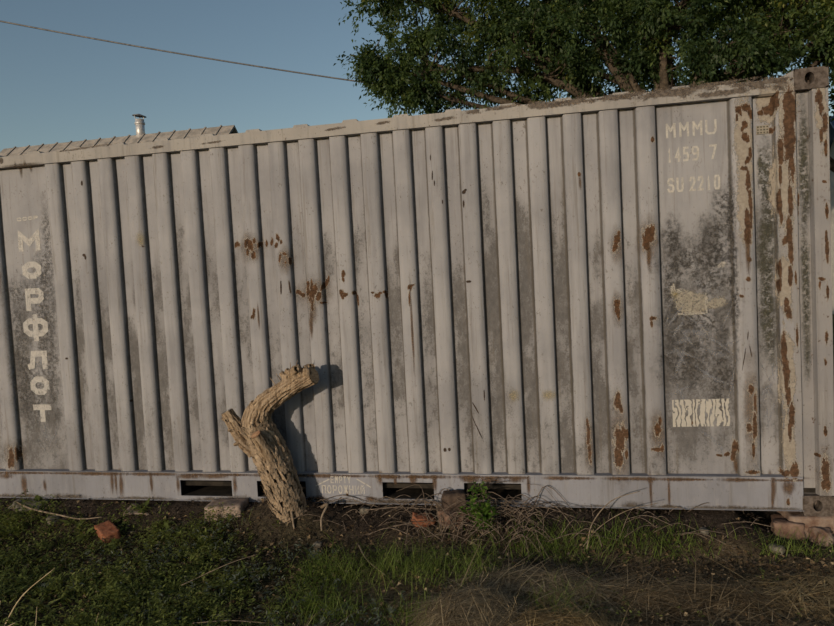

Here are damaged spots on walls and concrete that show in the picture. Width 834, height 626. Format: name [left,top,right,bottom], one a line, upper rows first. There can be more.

corrosion [814,87,829,158]
corrosion [234,233,293,266]
corrosion [611,230,621,254]
corrosion [641,224,657,265]
corrosion [735,78,800,443]
corrosion [280,275,330,337]
corrosion [0,444,259,494]
corrosion [375,471,445,489]
corrosion [605,389,705,505]
corrosion [814,452,832,492]